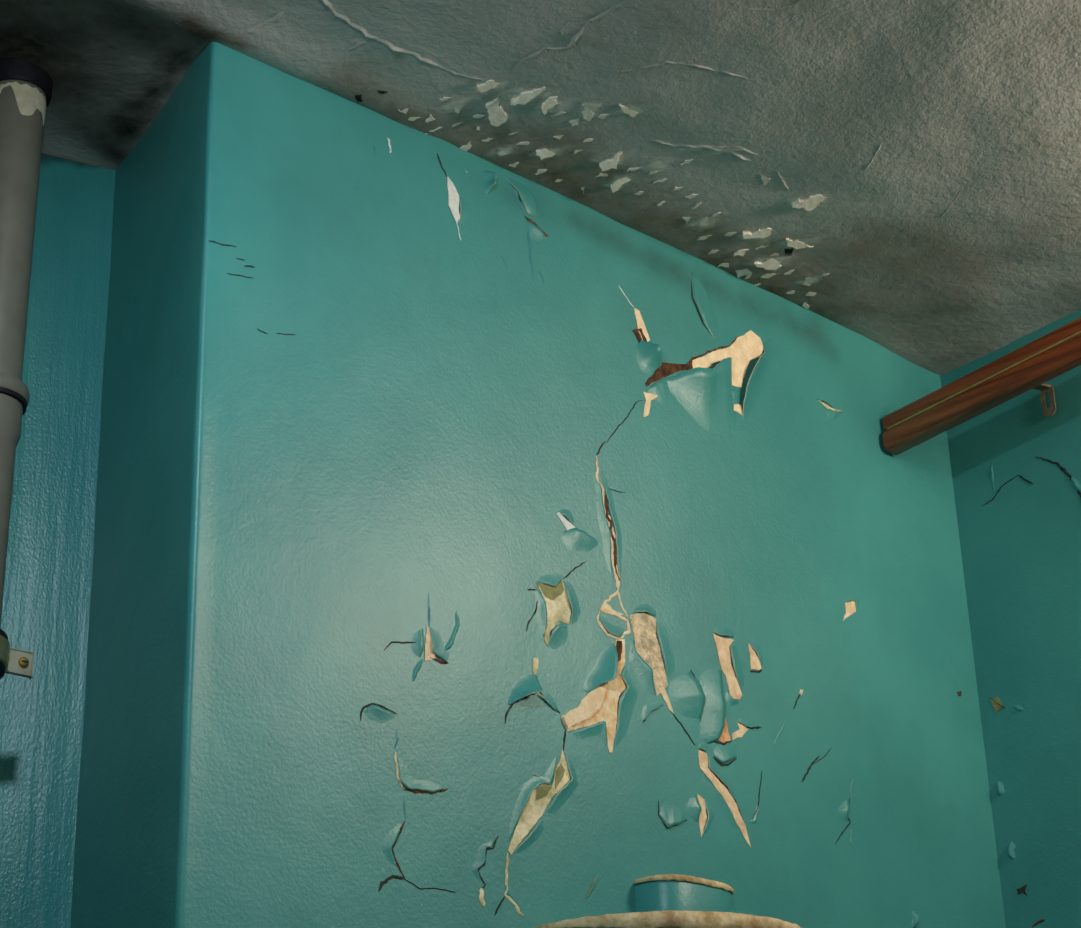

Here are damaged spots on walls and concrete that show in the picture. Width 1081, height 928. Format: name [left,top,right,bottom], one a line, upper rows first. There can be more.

crack [321,0,628,81]
crack [209,240,254,278]
peeling [437,153,470,240]
peeling [398,80,643,175]
peeling [594,148,831,309]
peeling [607,286,774,442]
crack [384,591,460,682]
peeling [526,509,599,649]
crack [593,441,627,591]
crack [983,456,1081,506]
peeling [505,590,764,855]
crack [360,703,524,917]